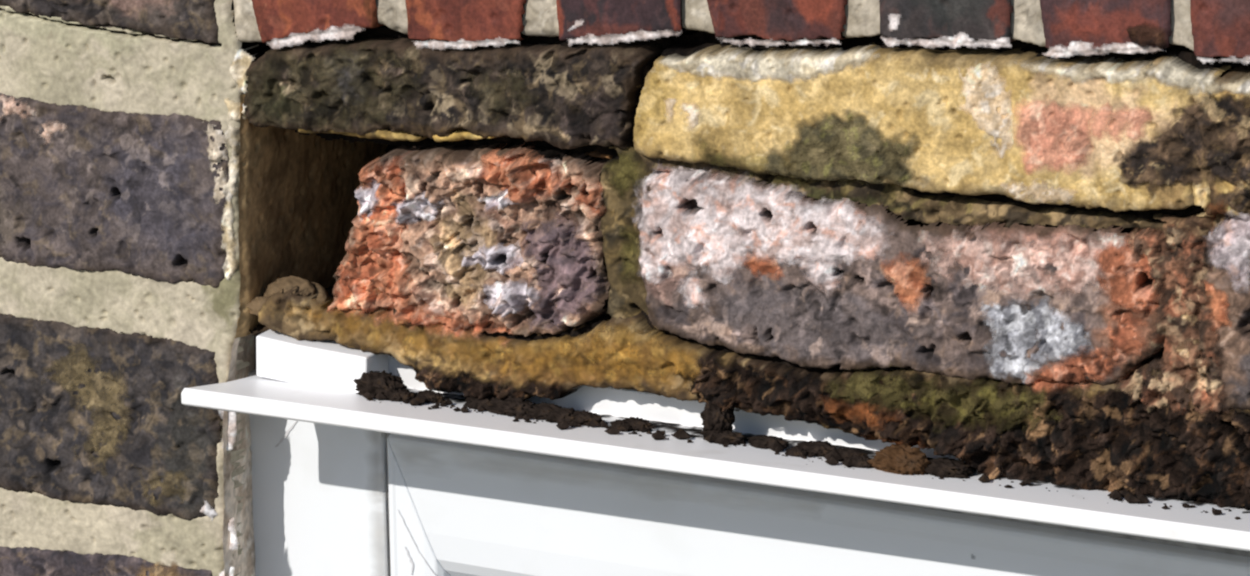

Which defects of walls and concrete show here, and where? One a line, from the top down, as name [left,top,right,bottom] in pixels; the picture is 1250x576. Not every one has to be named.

spalling [413,368,581,400]
spalling [637,168,1250,511]